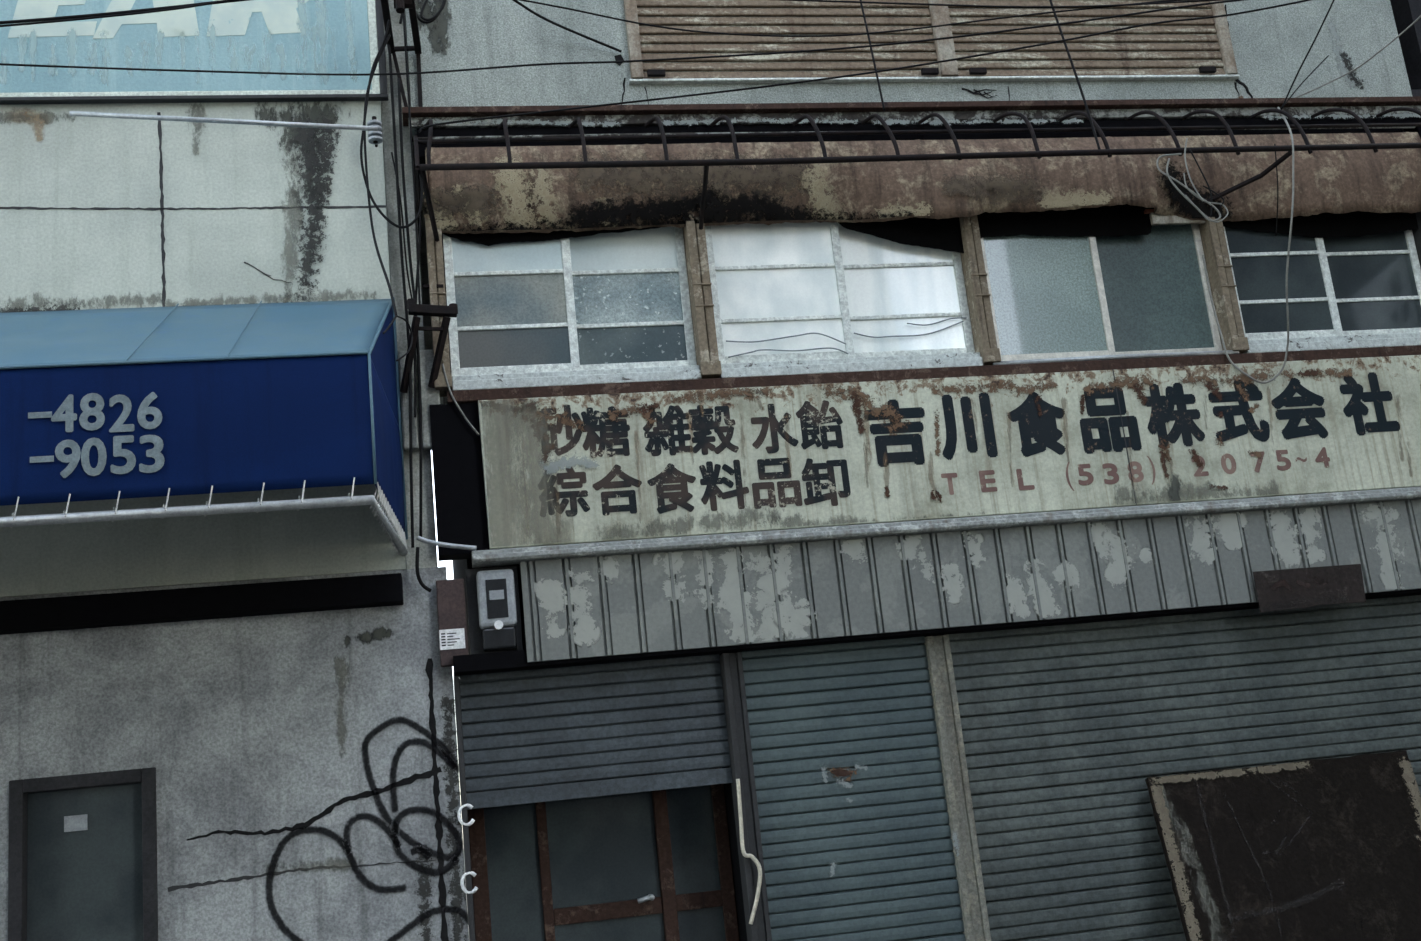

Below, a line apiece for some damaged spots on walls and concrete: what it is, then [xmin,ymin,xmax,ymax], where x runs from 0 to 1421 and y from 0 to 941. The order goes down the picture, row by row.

damp [0,0,357,84]
damp [1,101,376,313]
rust [607,387,774,428]
rust [815,384,911,436]
rust [932,378,1058,456]
rust [1078,374,1157,415]
rust [1178,368,1353,448]
peeling [652,544,818,643]
peeling [895,532,986,604]
peeling [1005,558,1080,619]
peeling [1184,513,1248,566]
peeling [1266,508,1326,569]